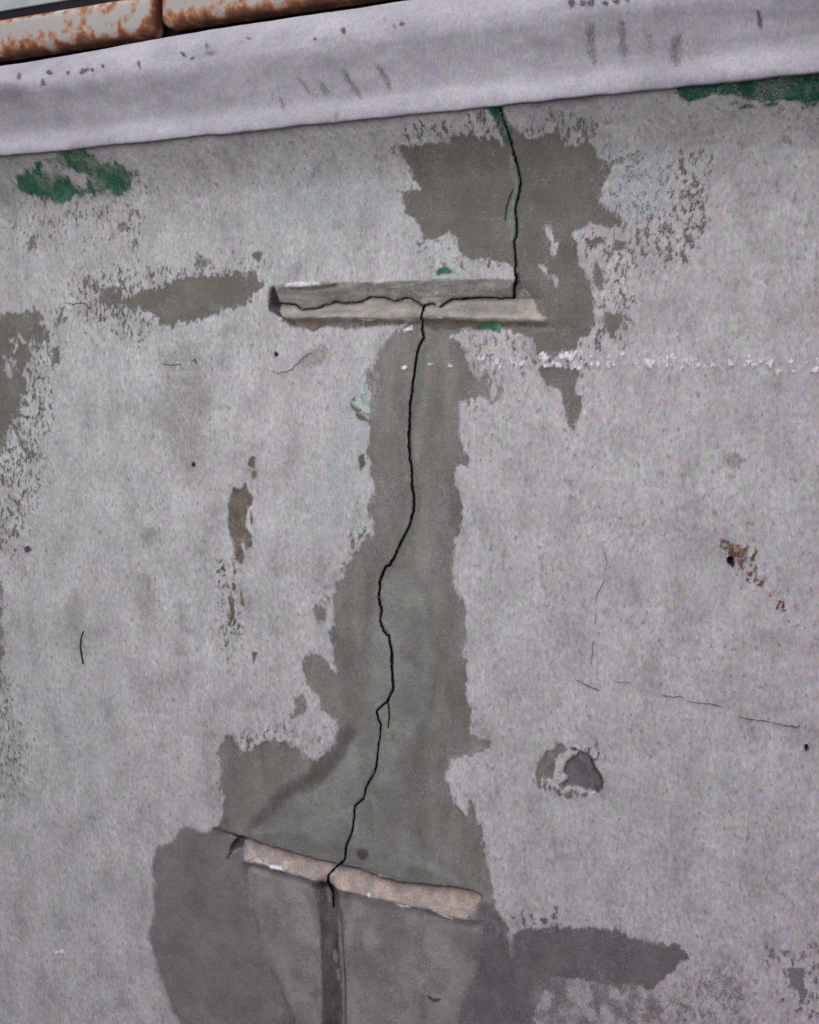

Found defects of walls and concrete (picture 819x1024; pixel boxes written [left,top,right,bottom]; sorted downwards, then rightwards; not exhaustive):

flaking render [0,581,39,816]
flaking render [0,181,265,559]
crack [280,107,522,908]
flaking render [211,108,719,934]
rust [720,537,810,632]
leakage [146,825,762,1024]